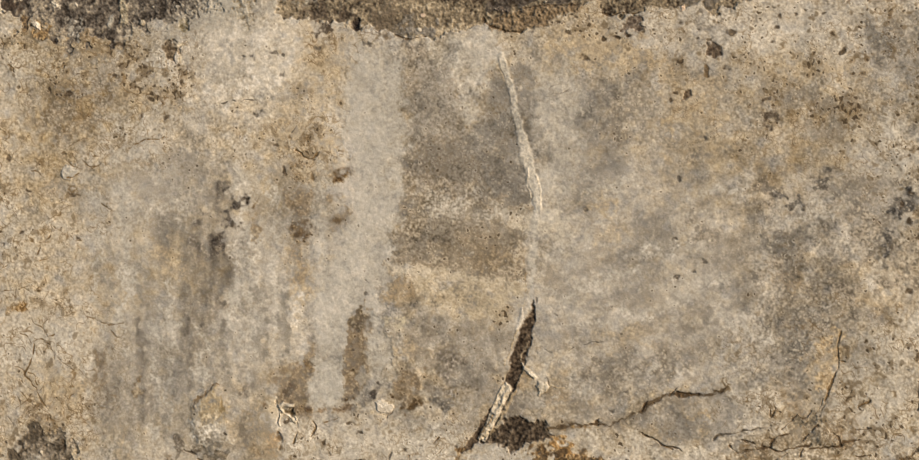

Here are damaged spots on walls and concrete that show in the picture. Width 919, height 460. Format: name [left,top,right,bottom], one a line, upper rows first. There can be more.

flaking render [0,0,204,56]
flaking render [274,0,756,79]
flaking render [668,87,693,103]
flaking render [271,134,320,182]
water stain [76,0,319,460]
water stain [237,36,477,425]
flaking render [274,397,366,452]
flaking render [369,398,395,418]
spalling [453,296,566,460]
crack [541,341,604,354]
crack [545,377,729,452]
crack [711,329,872,460]